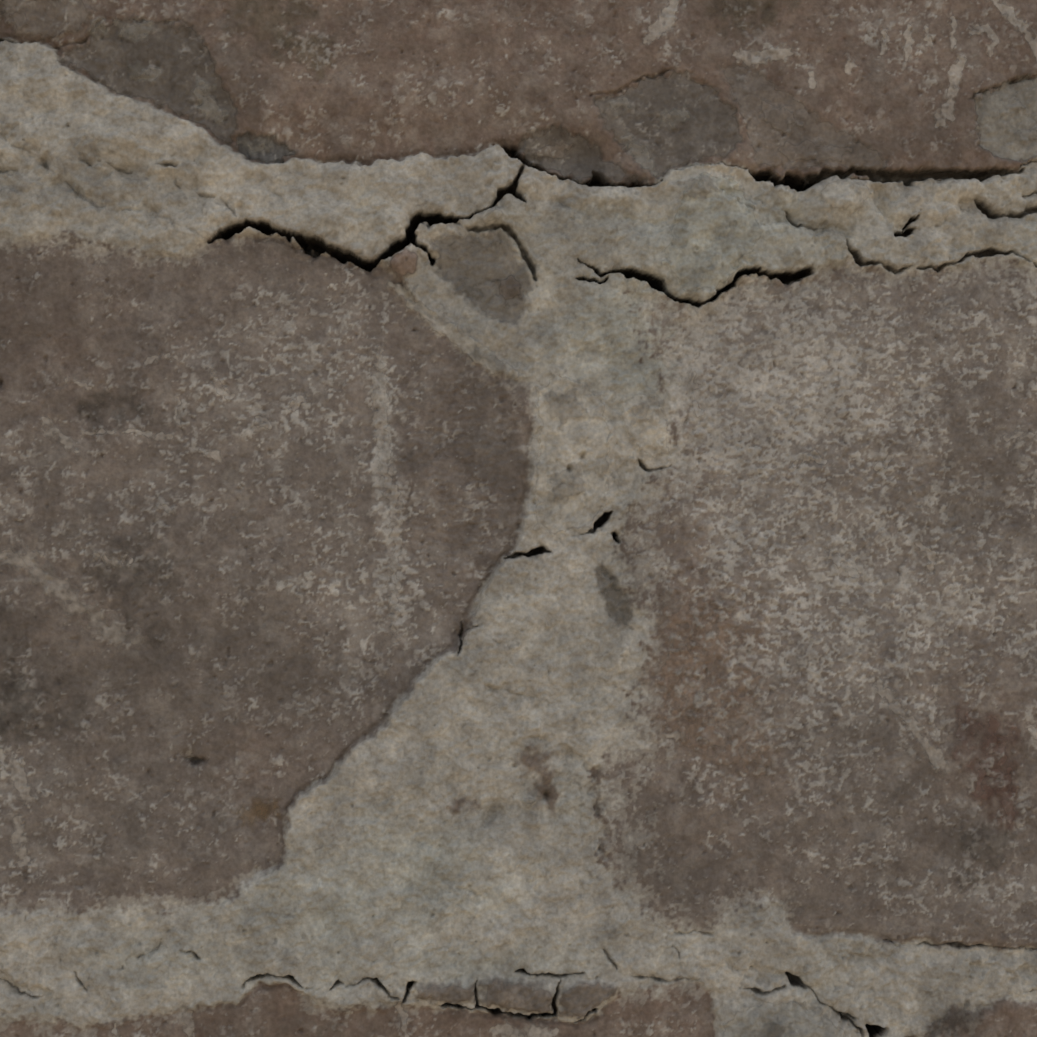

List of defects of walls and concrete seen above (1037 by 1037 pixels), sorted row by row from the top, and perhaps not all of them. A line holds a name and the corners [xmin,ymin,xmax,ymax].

crack [752,169,1037,219]
crack [208,150,535,278]
crack [894,217,917,237]
crack [848,248,1011,274]
crack [577,264,811,308]
crack [589,511,619,543]
crack [505,547,550,559]
crack [250,974,297,982]
crack [370,978,414,1002]
crack [442,968,566,1018]
crack [785,971,805,988]
crack [838,1012,862,1030]